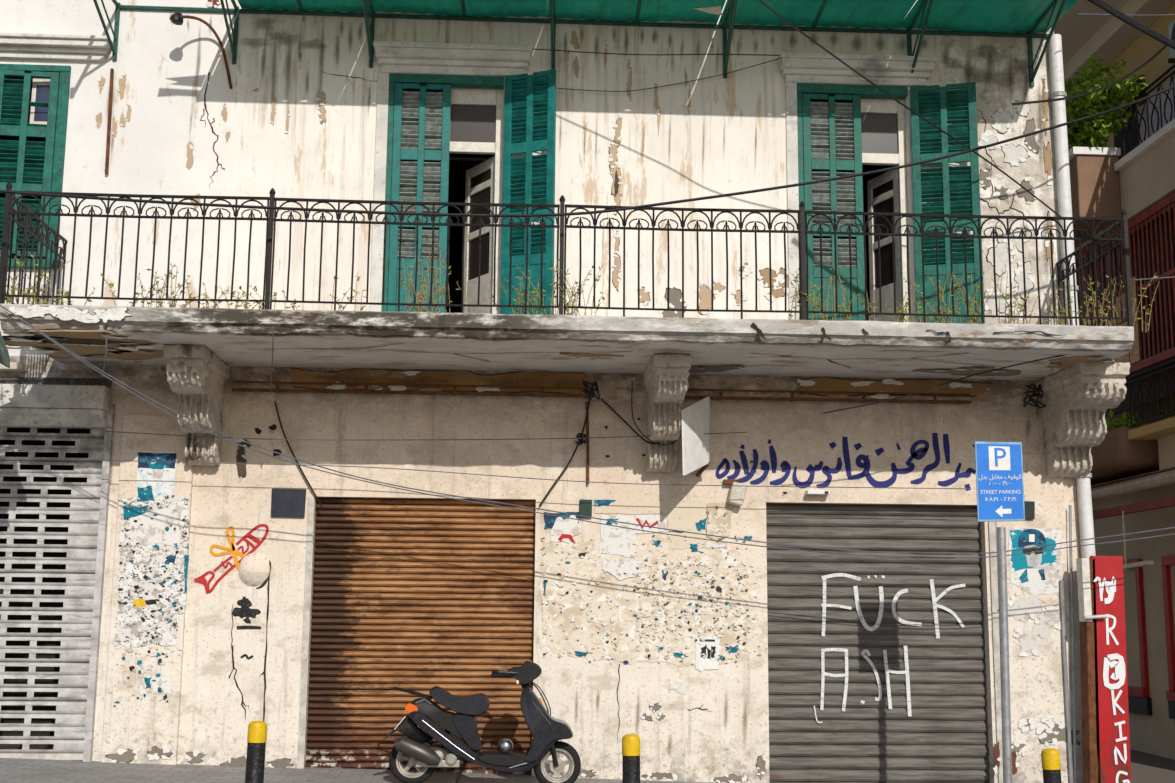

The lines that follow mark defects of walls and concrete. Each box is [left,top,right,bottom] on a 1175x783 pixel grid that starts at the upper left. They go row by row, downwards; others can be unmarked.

crack [200,72,225,187]
flaking render [609,113,623,215]
peeling [653,83,661,136]
peeling [978,76,1053,204]
flaking render [612,231,622,291]
peeling [637,263,789,318]
peeling [984,227,1035,318]
flaking render [1045,211,1054,278]
flaking render [290,367,588,394]
flaking render [560,352,624,360]